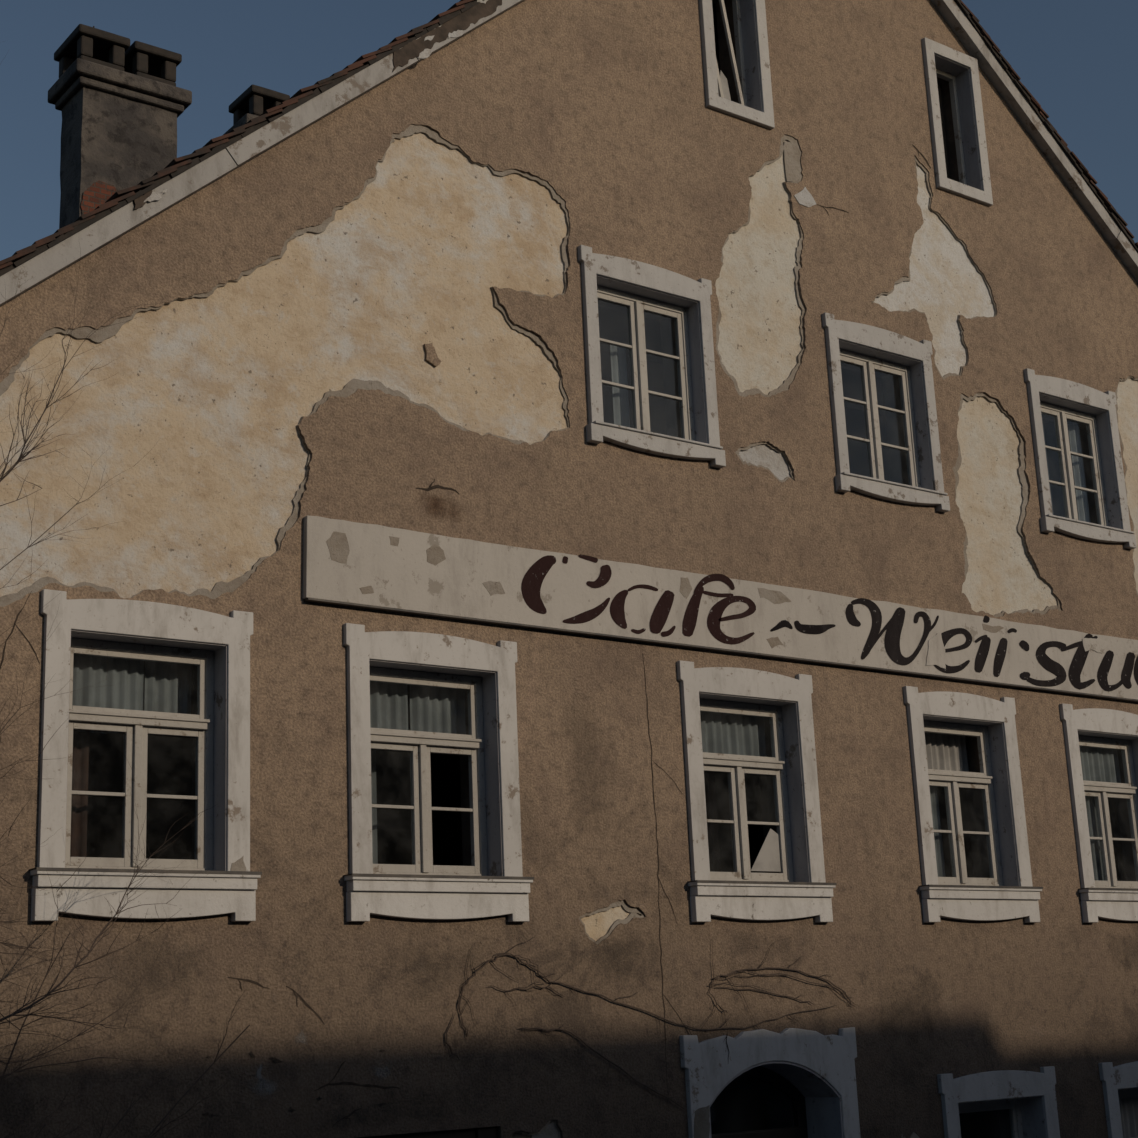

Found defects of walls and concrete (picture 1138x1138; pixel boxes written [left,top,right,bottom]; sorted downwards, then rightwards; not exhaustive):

peeling [392,0,502,72]
flaking render [0,120,575,607]
flaking render [715,135,816,397]
flaking render [735,436,798,482]
flaking render [872,157,996,380]
flaking render [952,387,1066,633]
flaking render [1115,376,1138,596]
flaking render [579,892,651,944]
crack [643,659,689,1111]